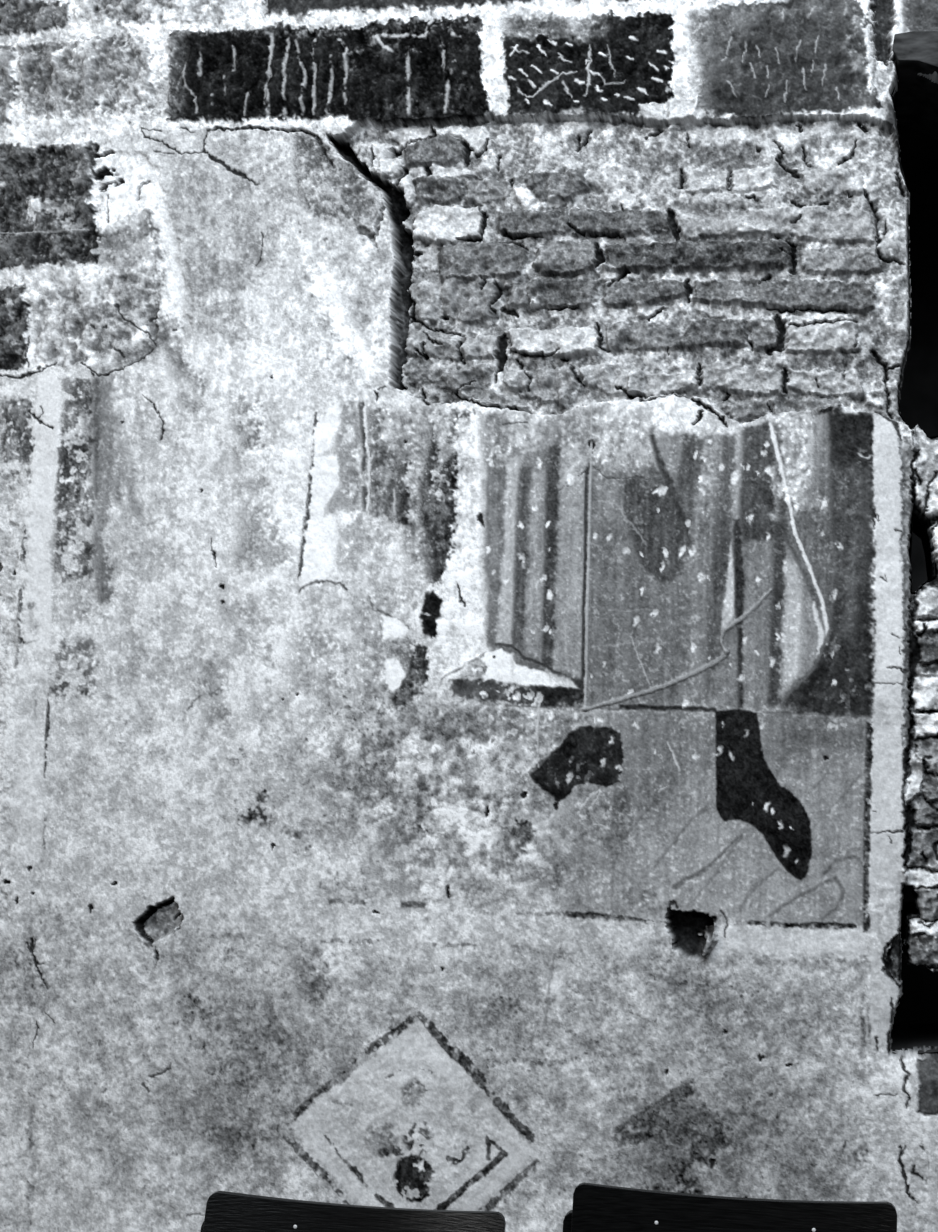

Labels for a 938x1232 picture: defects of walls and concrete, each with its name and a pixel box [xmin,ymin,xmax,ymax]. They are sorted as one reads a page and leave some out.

flaking render [86,149,181,324]
crack [0,302,178,380]
crack [27,405,55,431]
crack [139,121,774,712]
flaking render [287,59,916,749]
peeling [478,683,557,769]
peeling [593,714,624,772]
spalling [900,775,913,795]